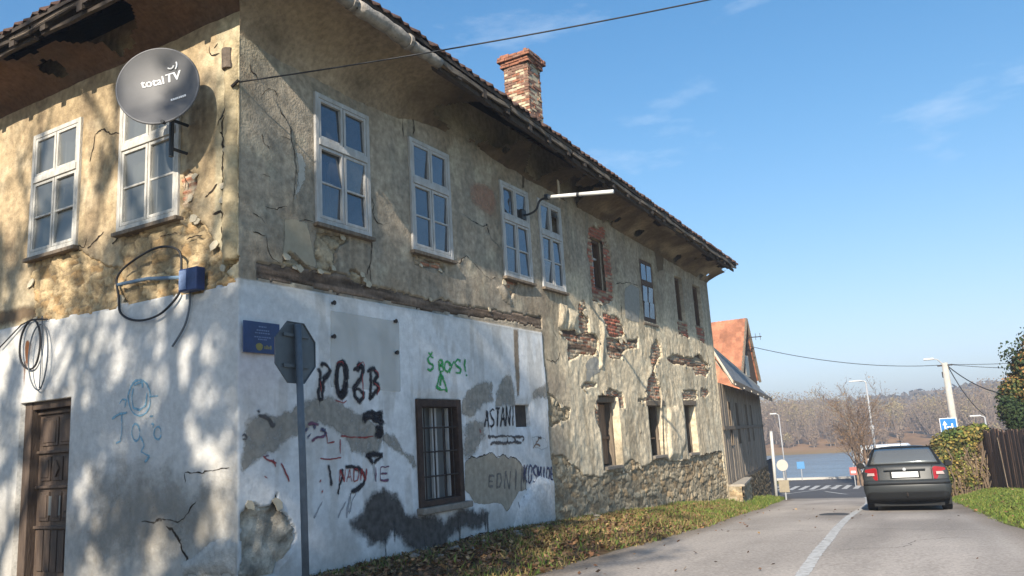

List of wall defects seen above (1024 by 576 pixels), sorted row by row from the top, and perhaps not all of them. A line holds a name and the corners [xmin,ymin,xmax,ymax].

crack [250,65,313,263]
flaking render [27,172,239,323]
peeling [282,219,346,275]
flaking render [559,222,637,360]
flaking render [638,322,709,404]
crack [142,468,227,561]
flaking render [238,495,293,576]